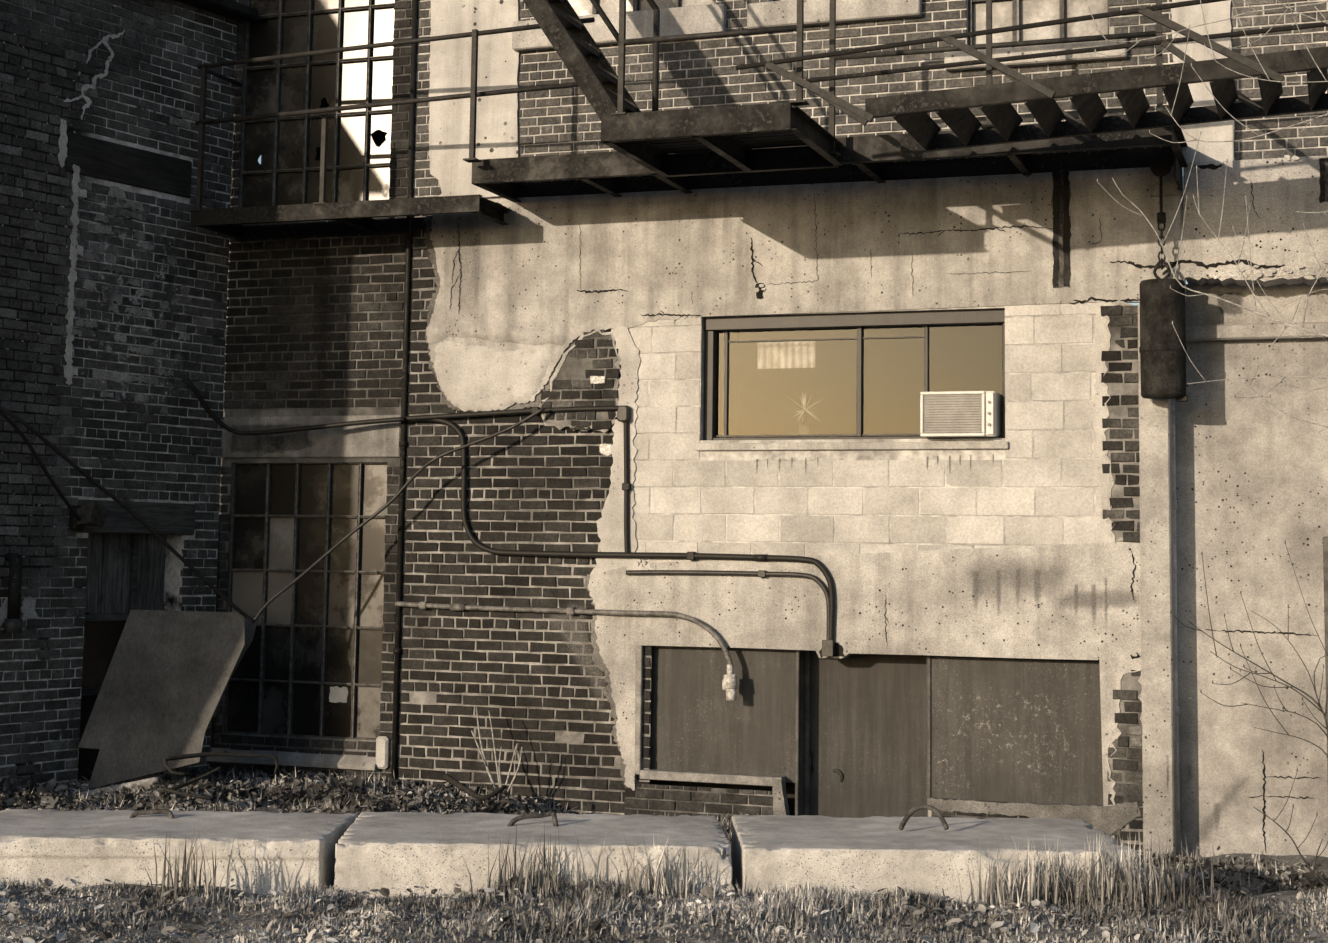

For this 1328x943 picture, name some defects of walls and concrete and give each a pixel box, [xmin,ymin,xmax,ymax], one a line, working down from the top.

crack [64,29,125,120]
crack [1070,259,1320,304]
spalling [1185,258,1328,281]
flaking render [1098,300,1140,544]
flaking render [584,574,626,785]
flaking render [1103,652,1143,854]
crack [1250,750,1320,852]